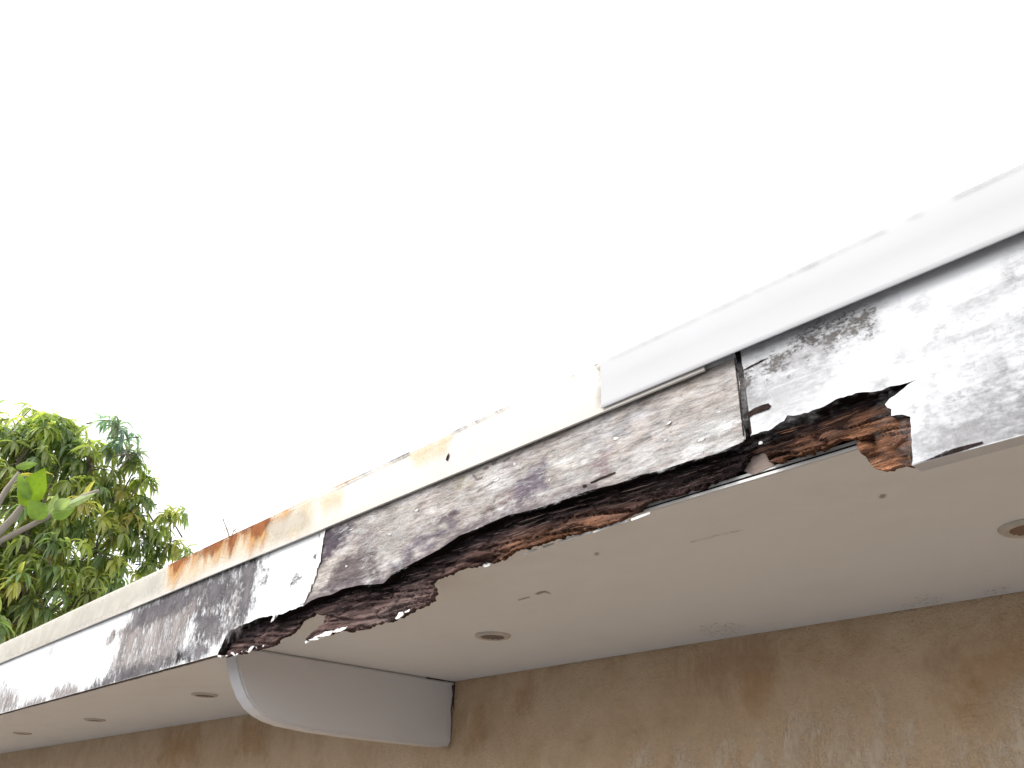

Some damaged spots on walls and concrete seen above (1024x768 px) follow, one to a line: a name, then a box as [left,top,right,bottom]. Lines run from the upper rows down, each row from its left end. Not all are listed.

leakage [741,307,875,391]
peeling [298,358,745,605]
corrosion [168,509,290,586]
leakage [0,558,270,713]
peeling [305,626,348,644]